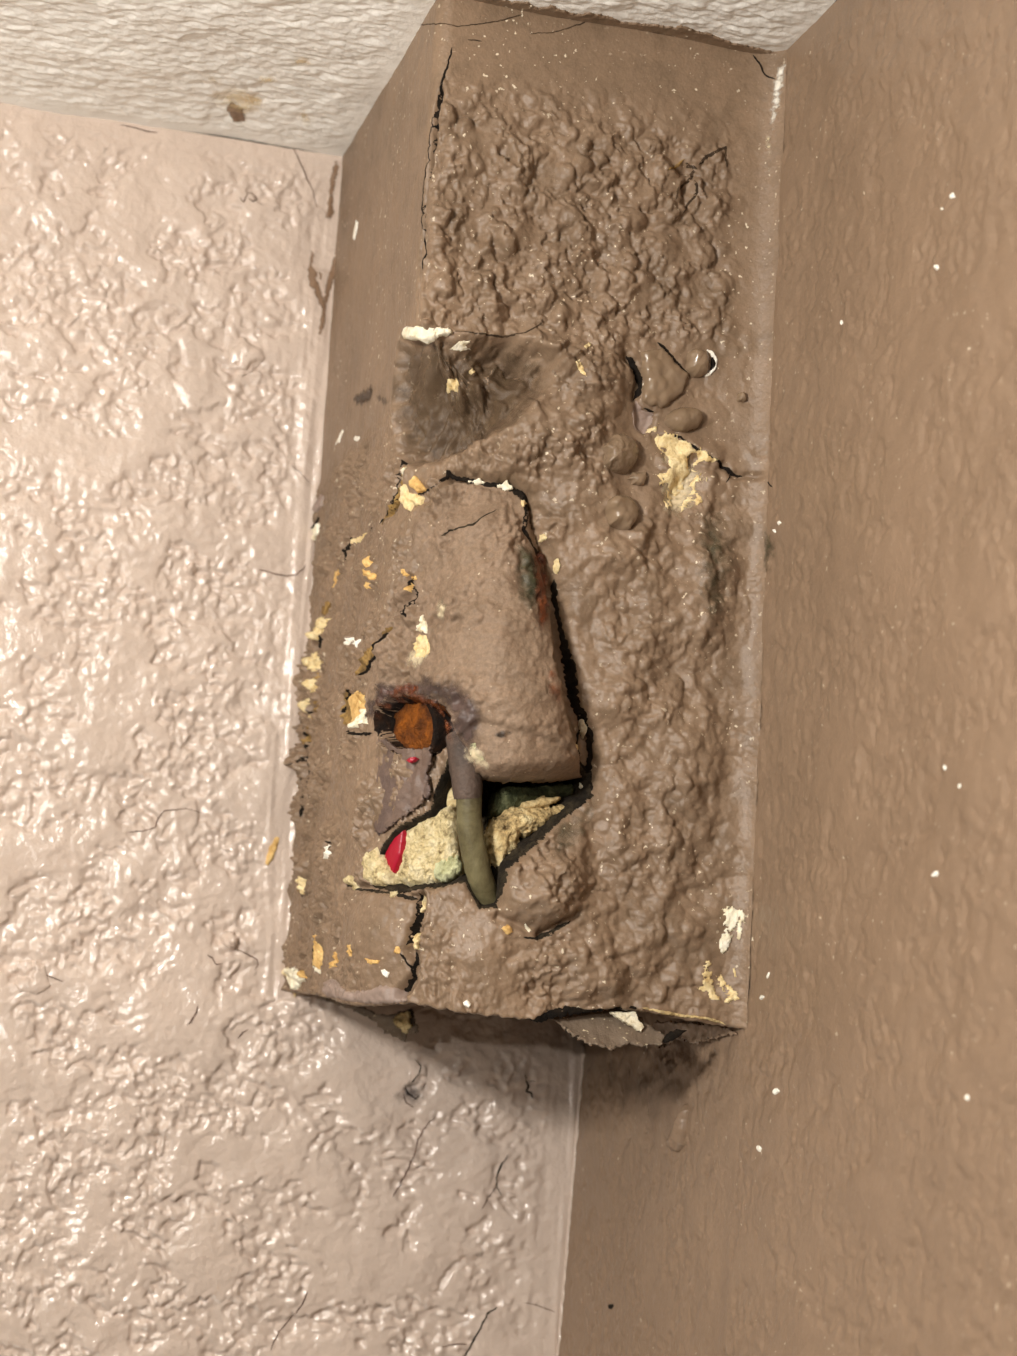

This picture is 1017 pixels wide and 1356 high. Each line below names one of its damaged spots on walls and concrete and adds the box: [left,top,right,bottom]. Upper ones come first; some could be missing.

crack [421,15,585,269]
flaking render [632,347,716,512]
flaking render [399,467,426,511]
flaking render [362,556,377,589]
flaking render [410,605,445,663]
crack [342,460,594,791]
corrosion [365,678,479,748]
flaking render [339,689,594,909]
crack [347,884,427,992]
flaking render [501,923,531,935]
flaking render [697,906,747,1004]
peeling [551,1007,738,1051]